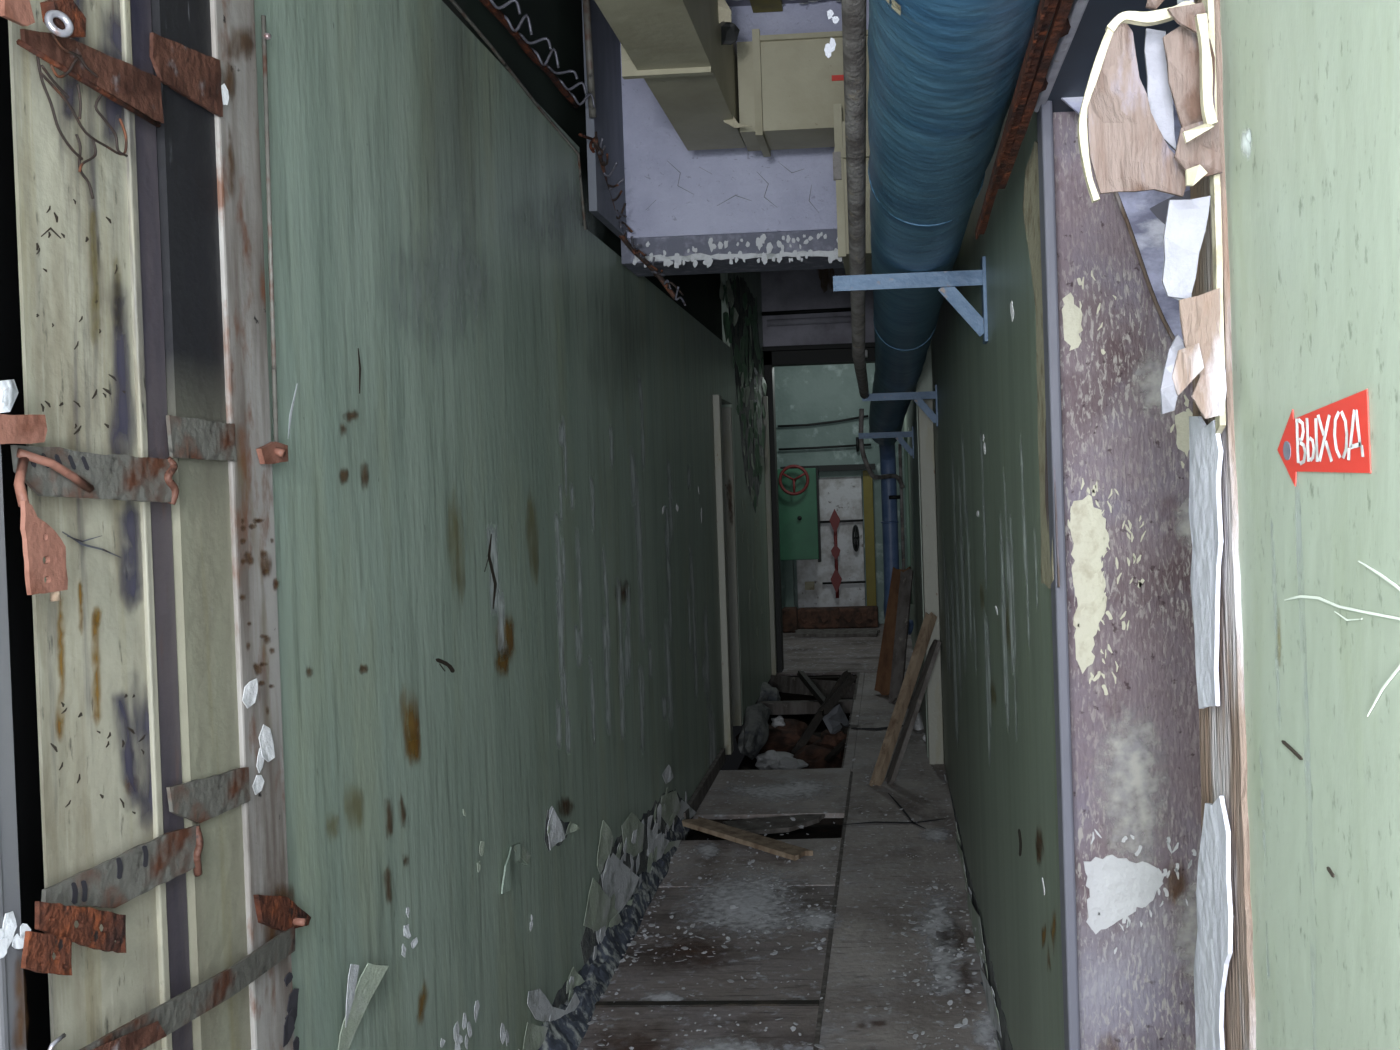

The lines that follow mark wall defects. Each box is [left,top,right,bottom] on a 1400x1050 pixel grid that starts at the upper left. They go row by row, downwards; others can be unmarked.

peeling [1062,271,1116,351]
peeling [633,232,843,513]
peeling [1136,360,1163,406]
peeling [1170,395,1193,468]
peeling [1177,499,1191,541]
peeling [1068,478,1146,695]
rust [497,621,513,673]
rust [404,705,420,759]
peeling [1083,722,1197,975]
peeling [500,765,696,1050]
peeling [440,1000,480,1050]